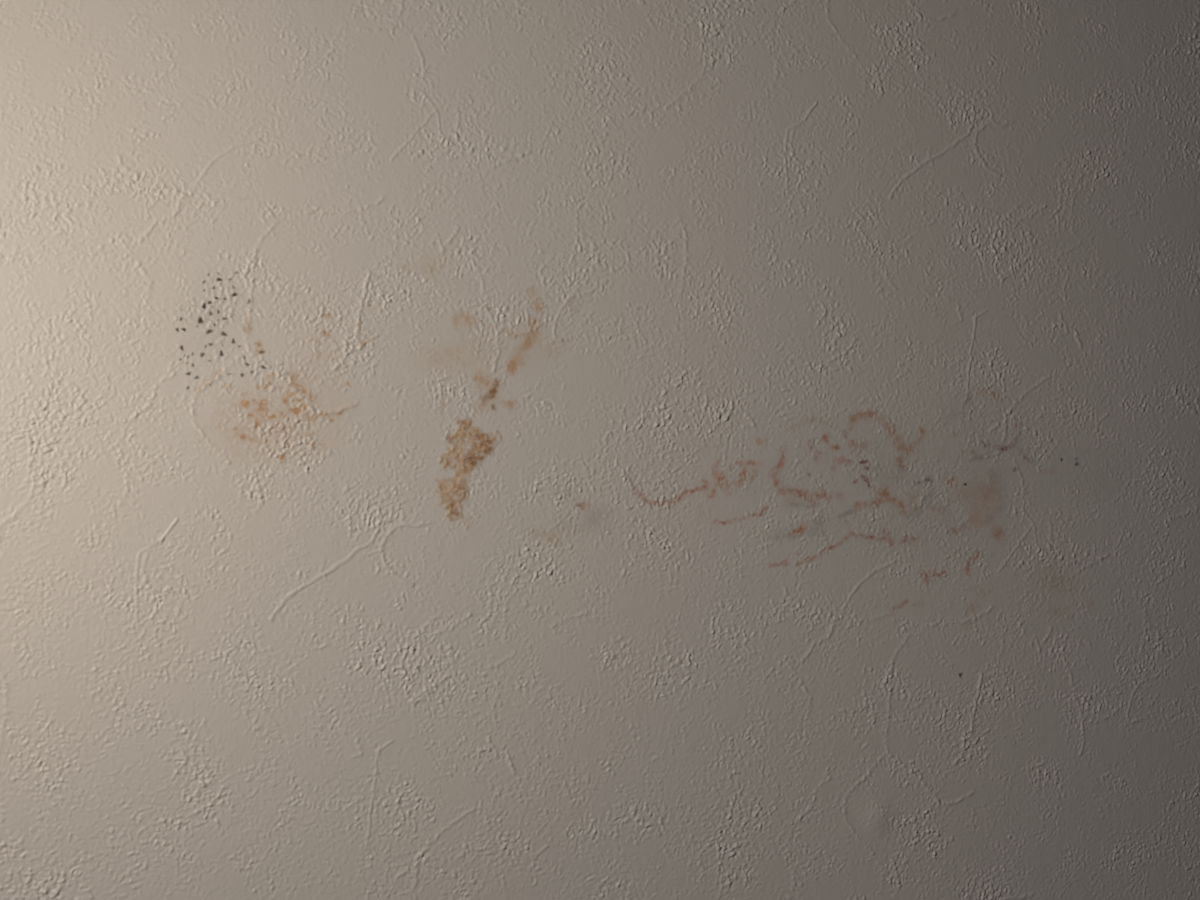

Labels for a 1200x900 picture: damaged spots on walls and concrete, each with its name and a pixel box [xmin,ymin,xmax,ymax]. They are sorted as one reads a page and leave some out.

leakage [172,263,268,391]
leakage [625,384,1145,633]